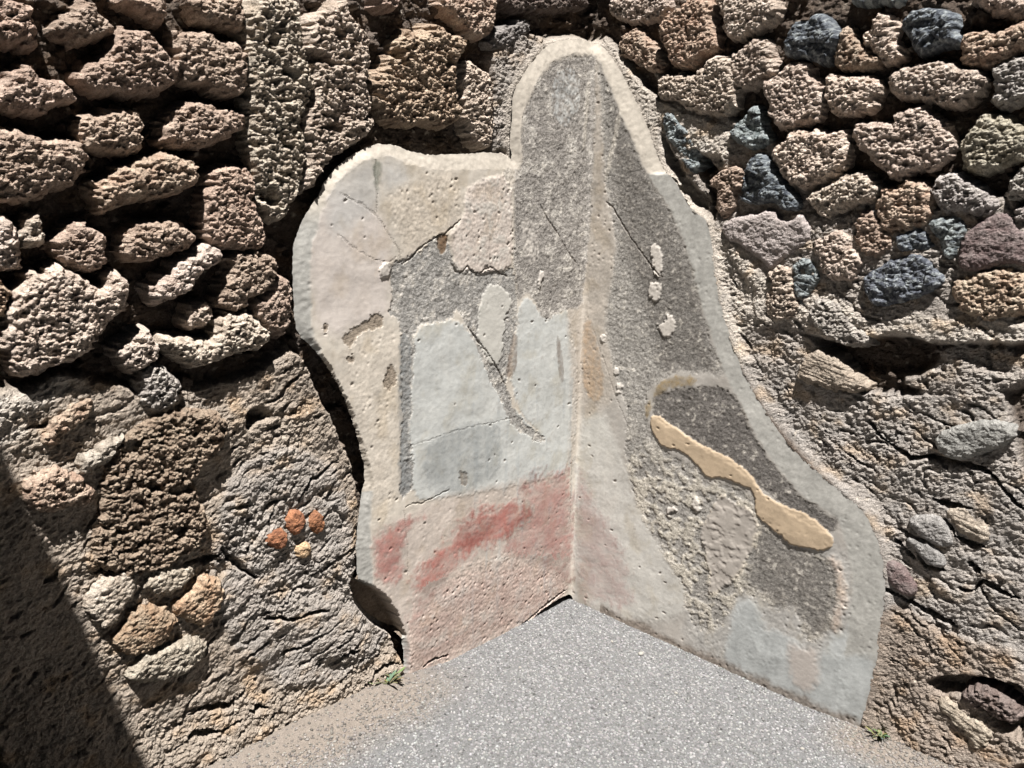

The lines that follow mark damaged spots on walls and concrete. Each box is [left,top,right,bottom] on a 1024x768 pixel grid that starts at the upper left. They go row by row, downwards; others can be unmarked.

crack [337,159,461,265]
crack [450,261,508,278]
crack [467,326,506,385]
spalling [341,53,839,643]